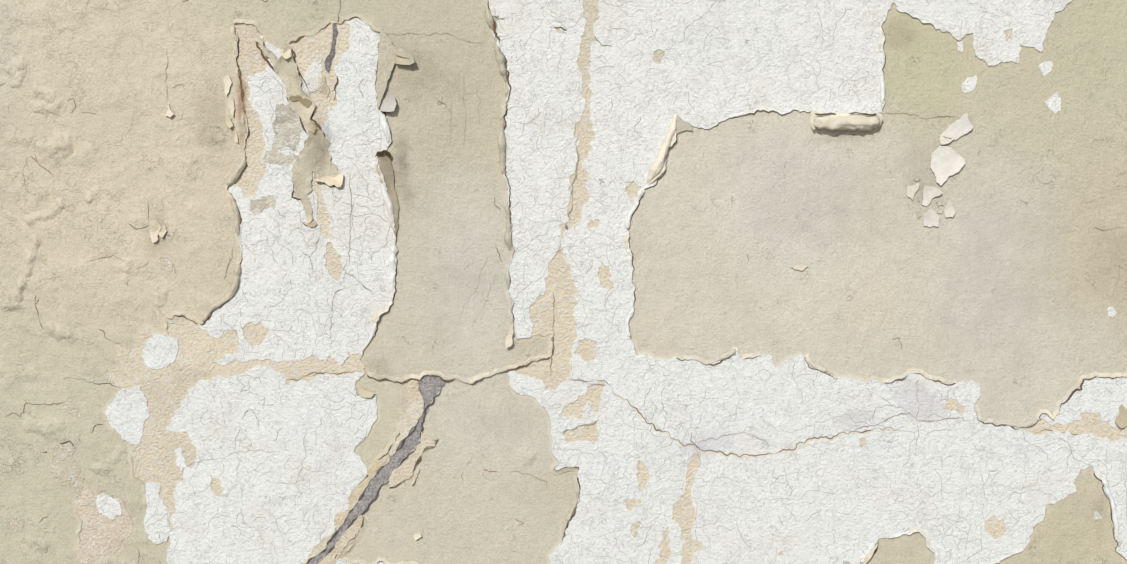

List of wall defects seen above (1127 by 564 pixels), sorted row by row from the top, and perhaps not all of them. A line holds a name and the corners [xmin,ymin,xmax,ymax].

peeling [102,13,550,564]
crack [301,375,446,564]
crack [550,293,964,459]
peeling [483,0,1127,564]